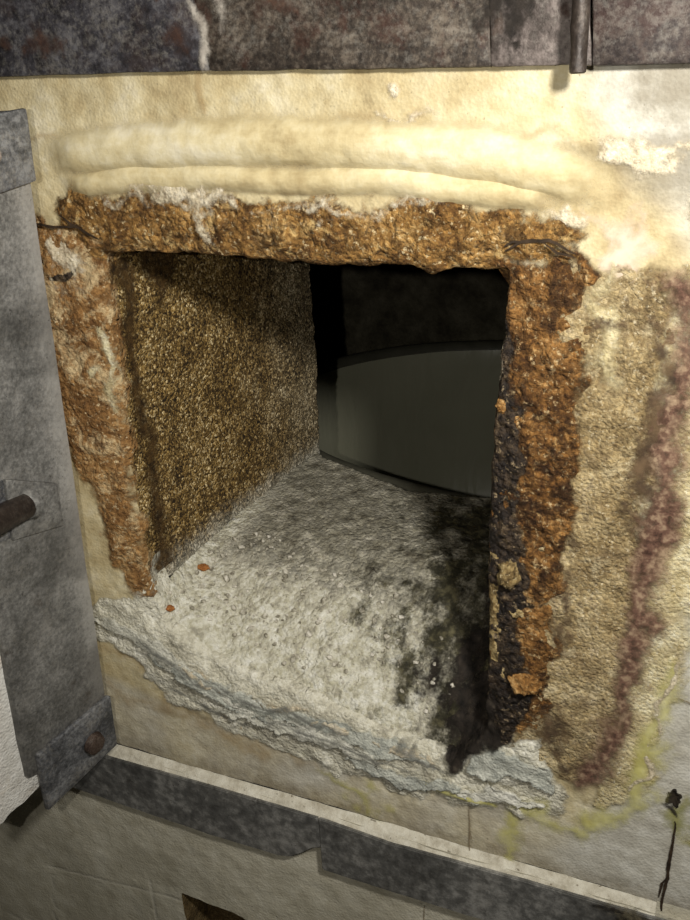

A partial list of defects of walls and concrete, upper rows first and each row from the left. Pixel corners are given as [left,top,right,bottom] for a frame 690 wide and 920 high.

spalling [35,184,690,819]
leakage [349,495,503,774]
crack [658,821,689,911]